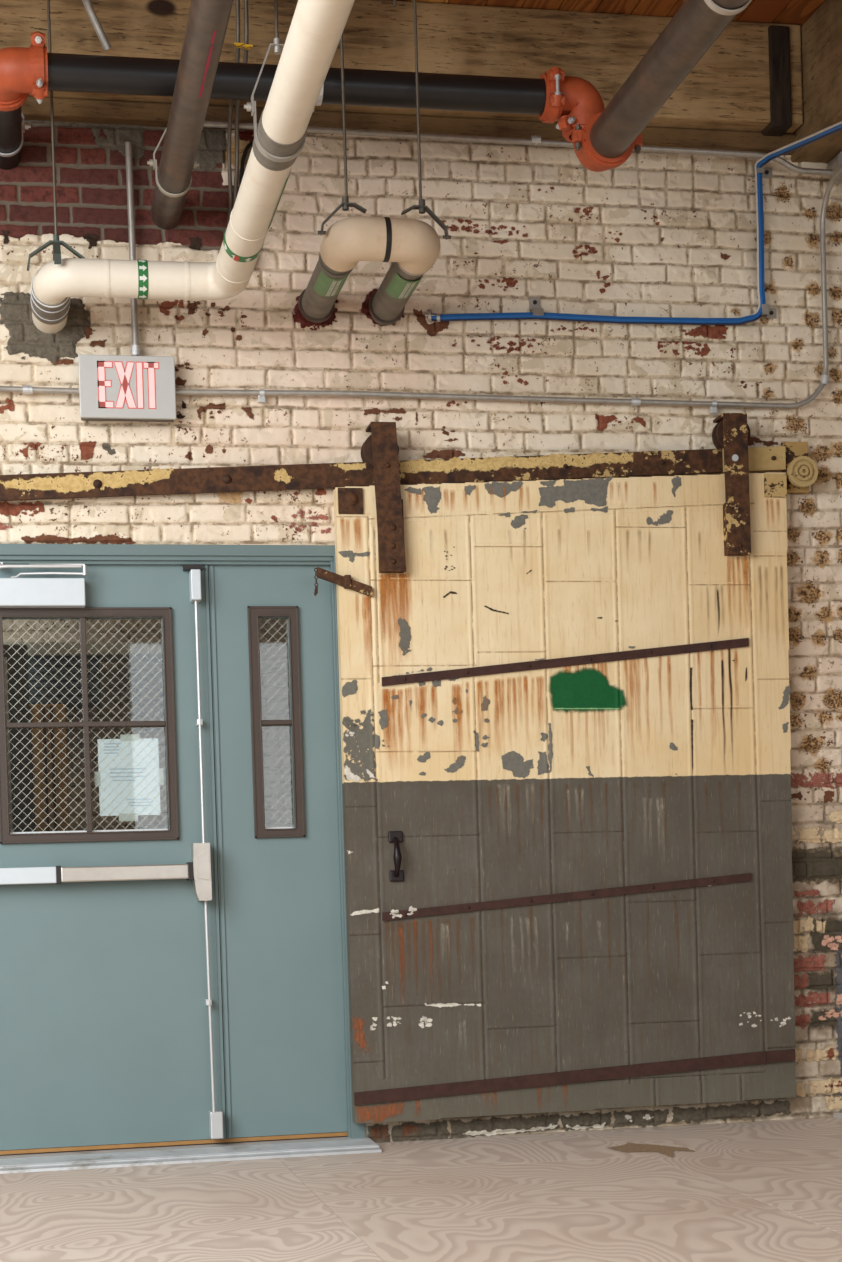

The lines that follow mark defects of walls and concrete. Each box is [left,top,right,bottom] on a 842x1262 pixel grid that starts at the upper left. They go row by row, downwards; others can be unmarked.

flaking render [79,441,116,460]
corrosion [812,443,842,487]
spalling [0,500,136,544]
peeling [499,477,612,529]
corrosion [364,574,409,625]
peeling [342,667,468,782]
corrosion [384,687,434,729]
corrosion [453,677,542,723]
peeling [502,723,553,778]
flaking render [739,889,842,1029]
water stain [464,1123,606,1137]
water stain [609,1142,694,1156]